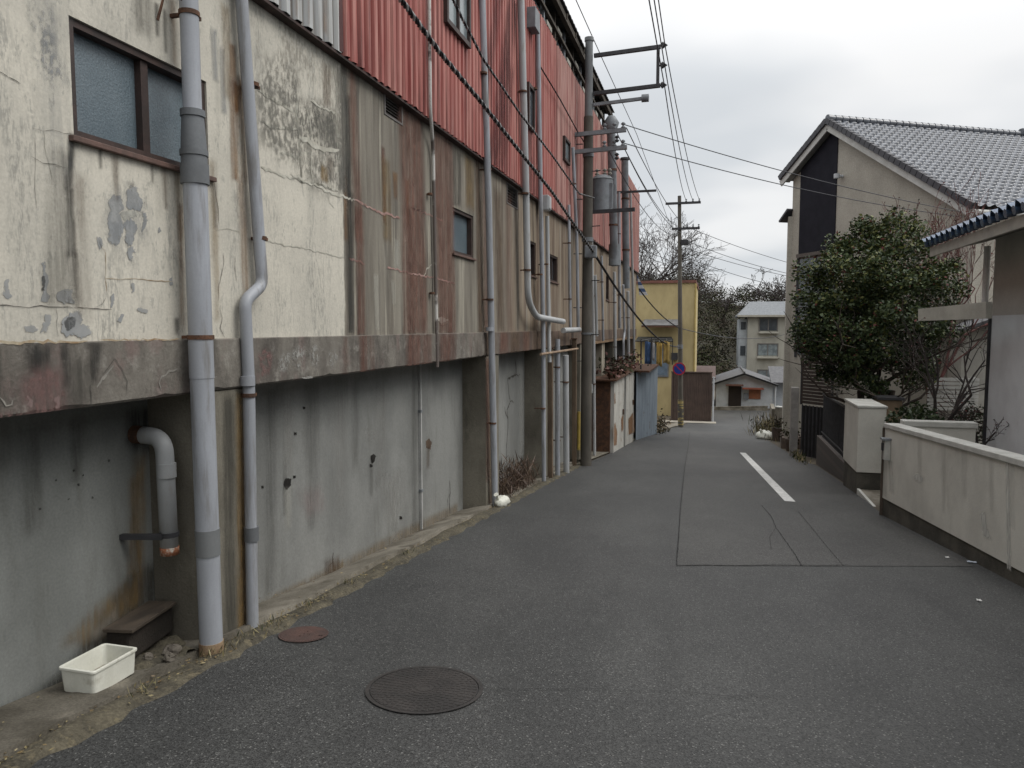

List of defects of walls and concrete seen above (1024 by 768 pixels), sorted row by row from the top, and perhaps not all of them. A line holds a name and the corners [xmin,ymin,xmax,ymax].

water stain [261,69,349,191]
peeling [97,185,161,261]
crack [291,173,442,221]
rust [382,114,426,333]
peeling [24,262,91,339]
water stain [78,565,155,656]